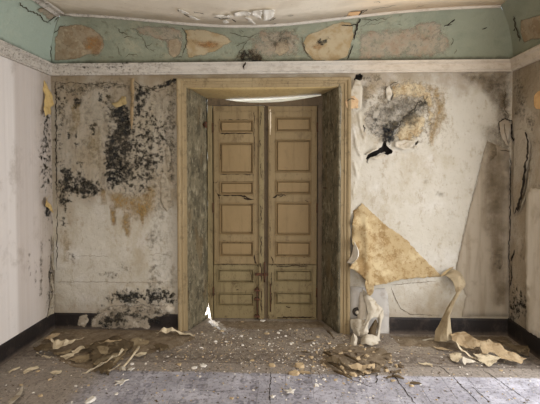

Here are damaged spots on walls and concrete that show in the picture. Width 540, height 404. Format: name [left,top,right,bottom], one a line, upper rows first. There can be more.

peeling [215,10,275,25]
spalling [252,11,361,61]
peeling [360,22,449,59]
peeling [43,81,54,116]
water stain [39,79,176,235]
peeling [367,288,390,334]